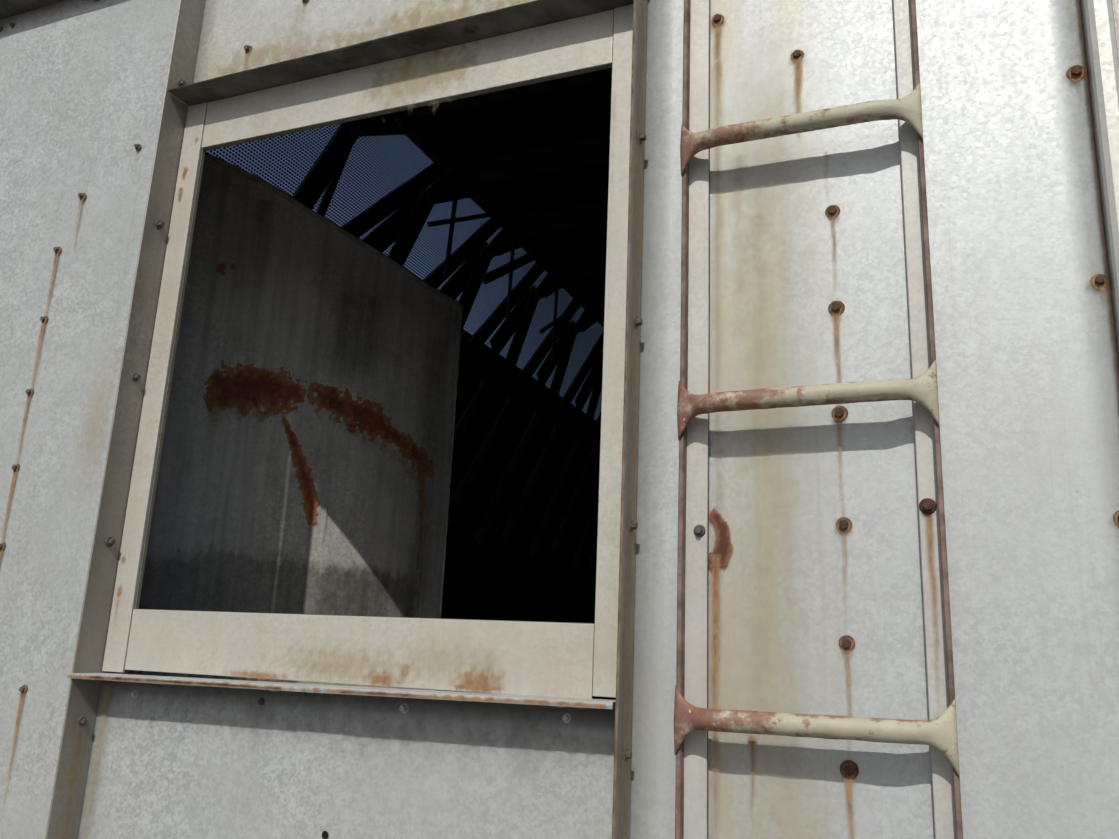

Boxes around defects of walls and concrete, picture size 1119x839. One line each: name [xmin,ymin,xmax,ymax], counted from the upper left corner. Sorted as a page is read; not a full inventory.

corrosion [791,50,803,112]
corrosion [831,307,841,382]
corrosion [0,250,59,557]
corrosion [203,360,433,569]
corrosion [708,509,733,709]
corrosion [843,642,853,697]
corrosion [10,687,26,764]
corrosion [843,765,854,839]